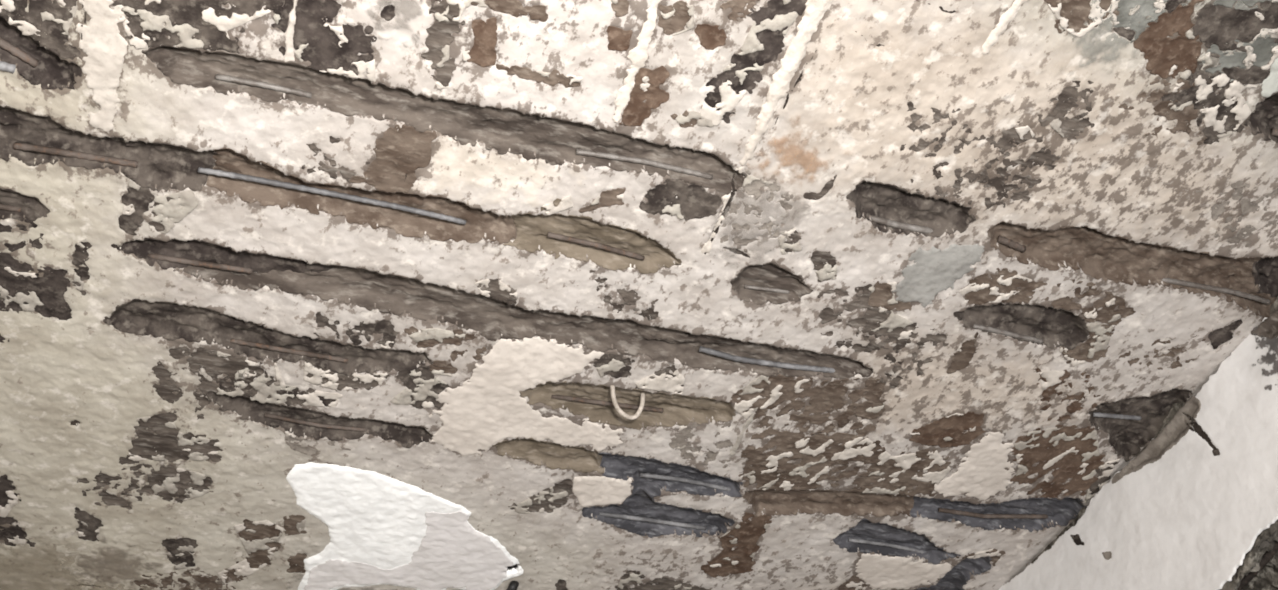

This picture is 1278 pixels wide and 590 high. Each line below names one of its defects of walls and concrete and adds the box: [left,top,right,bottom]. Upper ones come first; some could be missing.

peeling [0,188,92,320]
spalling [0,0,807,274]
peeling [803,175,837,200]
spalling [846,80,1095,238]
spalling [946,221,1278,422]
peeling [1118,0,1278,145]
peeling [1199,181,1278,250]
peeling [77,361,223,510]
spalling [103,237,1201,590]
peeling [0,474,36,547]
peeling [74,507,104,541]
spalling [1220,520,1278,590]